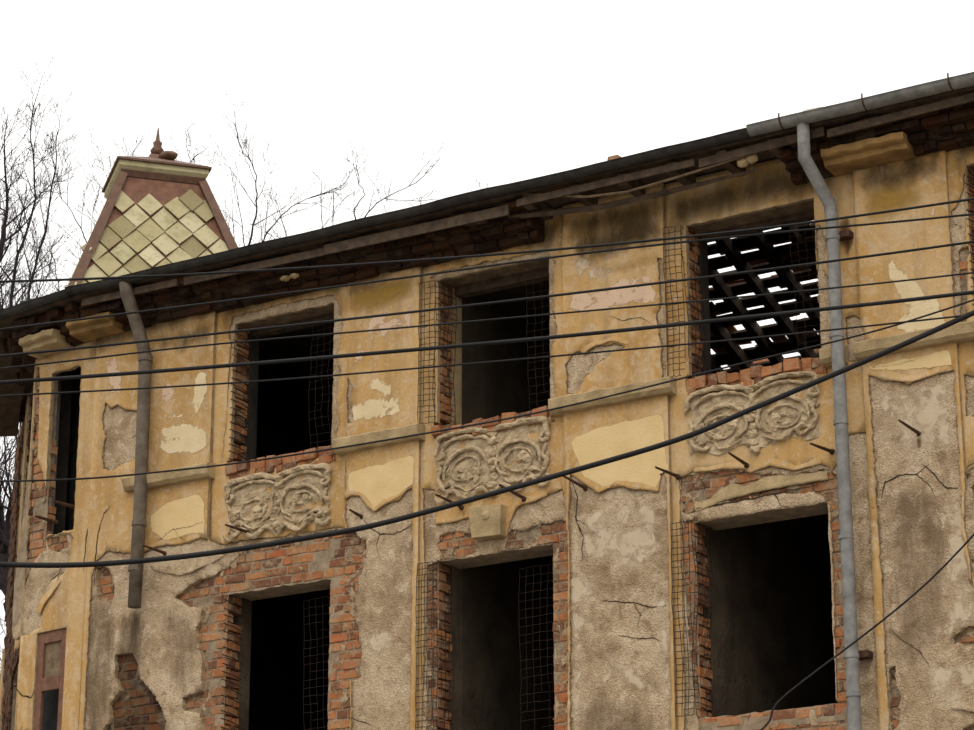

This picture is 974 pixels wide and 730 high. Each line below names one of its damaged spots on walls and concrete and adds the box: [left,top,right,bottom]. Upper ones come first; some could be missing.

peeling [100,357,137,471]
peeling [158,371,207,454]
spalling [228,295,400,440]
spalling [431,252,625,399]
peeling [569,258,666,378]
peeling [888,165,974,332]
flaking render [2,367,73,730]
peeling [679,456,848,730]
peeling [846,316,974,730]